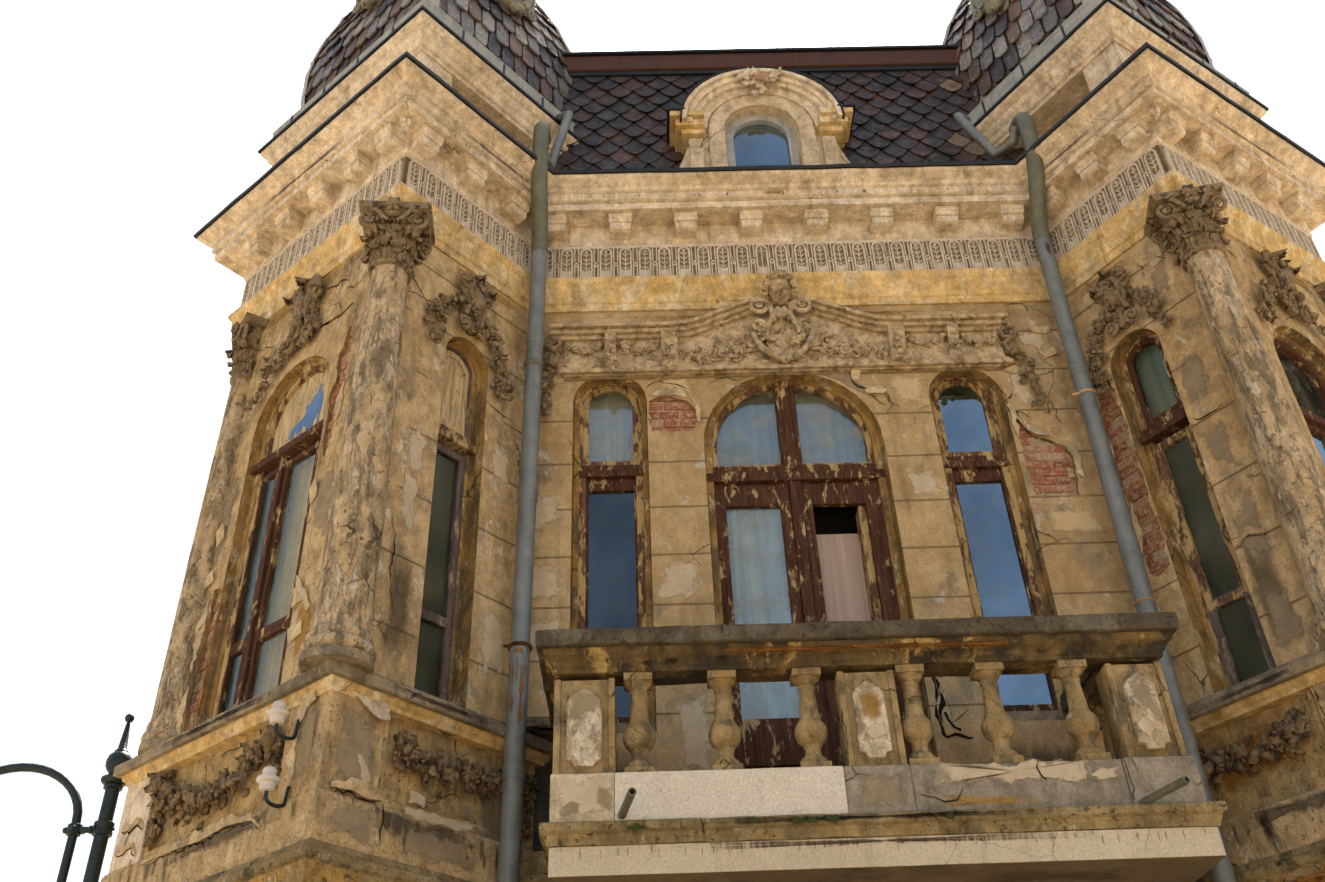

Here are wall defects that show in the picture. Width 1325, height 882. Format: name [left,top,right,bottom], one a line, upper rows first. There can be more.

flaking render [649,379,701,433]
flaking render [1004,362,1103,531]
flaking render [1101,381,1170,577]
flaking render [863,696,879,718]
crack [932,677,973,739]
crack [921,788,963,802]
peeling [935,759,1118,805]